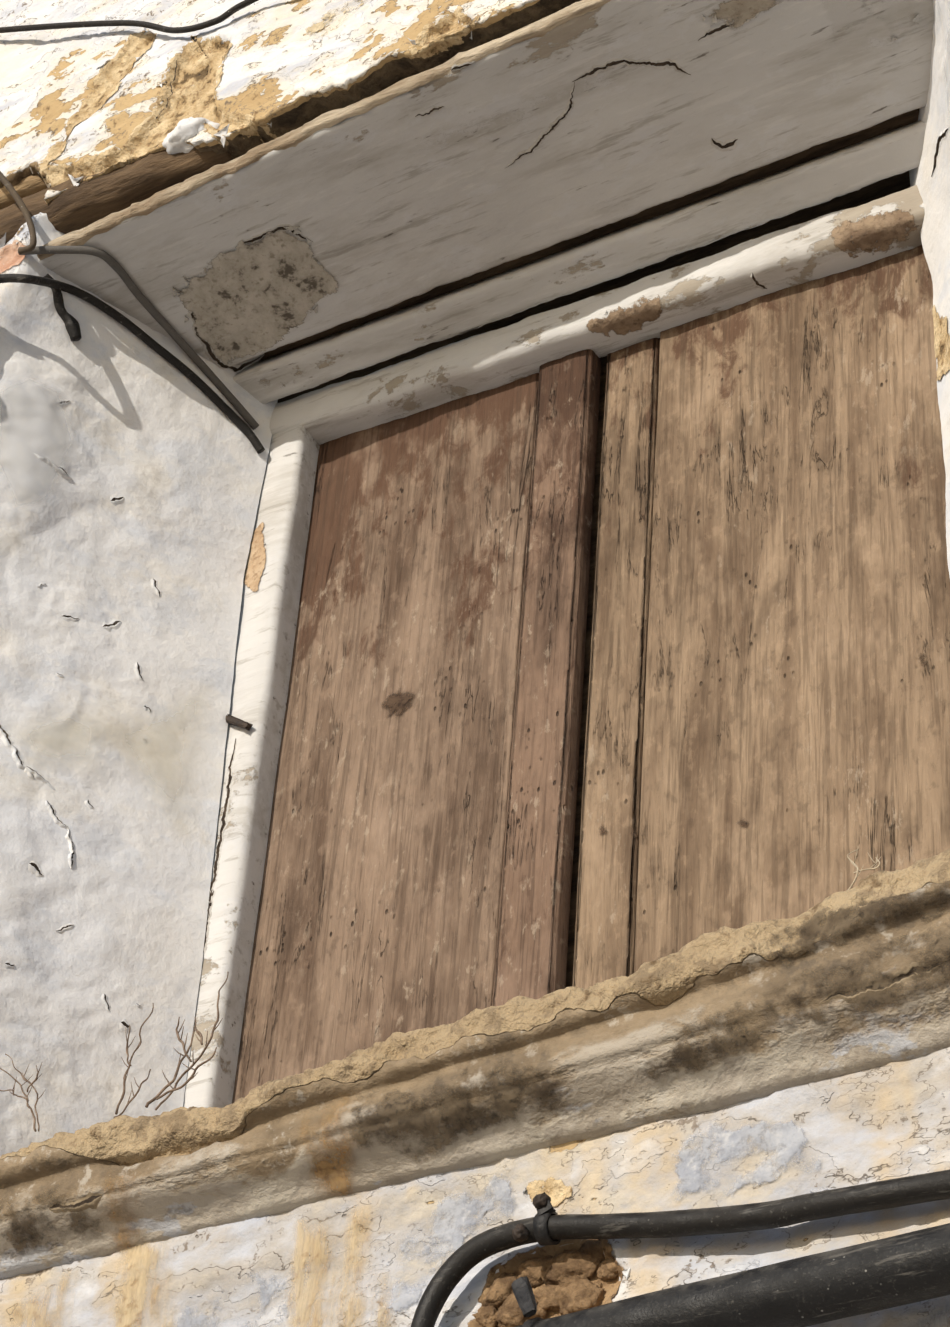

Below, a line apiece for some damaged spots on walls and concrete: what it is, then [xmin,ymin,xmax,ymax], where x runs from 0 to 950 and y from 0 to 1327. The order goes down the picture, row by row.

spalling [0,28,277,192]
crack [505,12,760,169]
peeling [831,207,917,258]
peeling [587,295,662,337]
peeling [243,522,266,591]
crack [0,724,75,869]
crack [199,738,237,984]
damp [769,882,950,1026]
damp [646,1006,760,1079]
damp [348,1064,562,1161]
damp [0,1188,99,1251]
spalling [468,1239,631,1327]